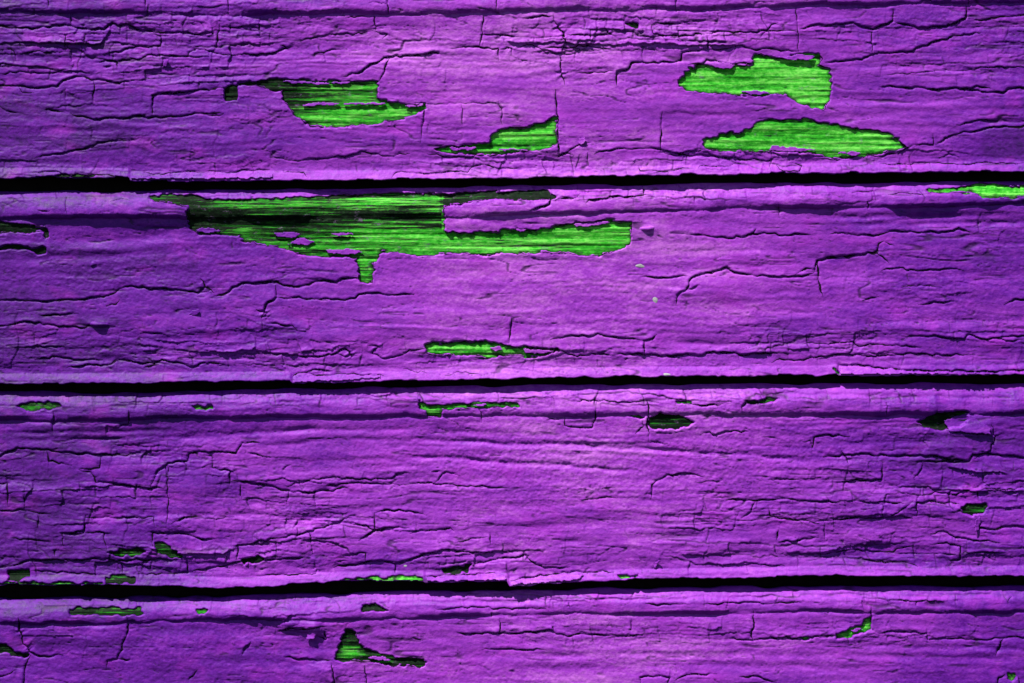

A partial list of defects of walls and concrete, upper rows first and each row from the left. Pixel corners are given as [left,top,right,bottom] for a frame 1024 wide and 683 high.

peeling [224,78,426,128]
peeling [434,116,558,155]
crack [0,0,1024,213]
peeling [678,53,907,159]
peeling [150,189,632,284]
crack [640,204,969,305]
crack [0,277,411,368]
peeling [425,340,560,359]
crack [550,333,1024,374]
crack [0,410,611,581]
crack [650,425,1024,567]
peeling [335,629,426,668]